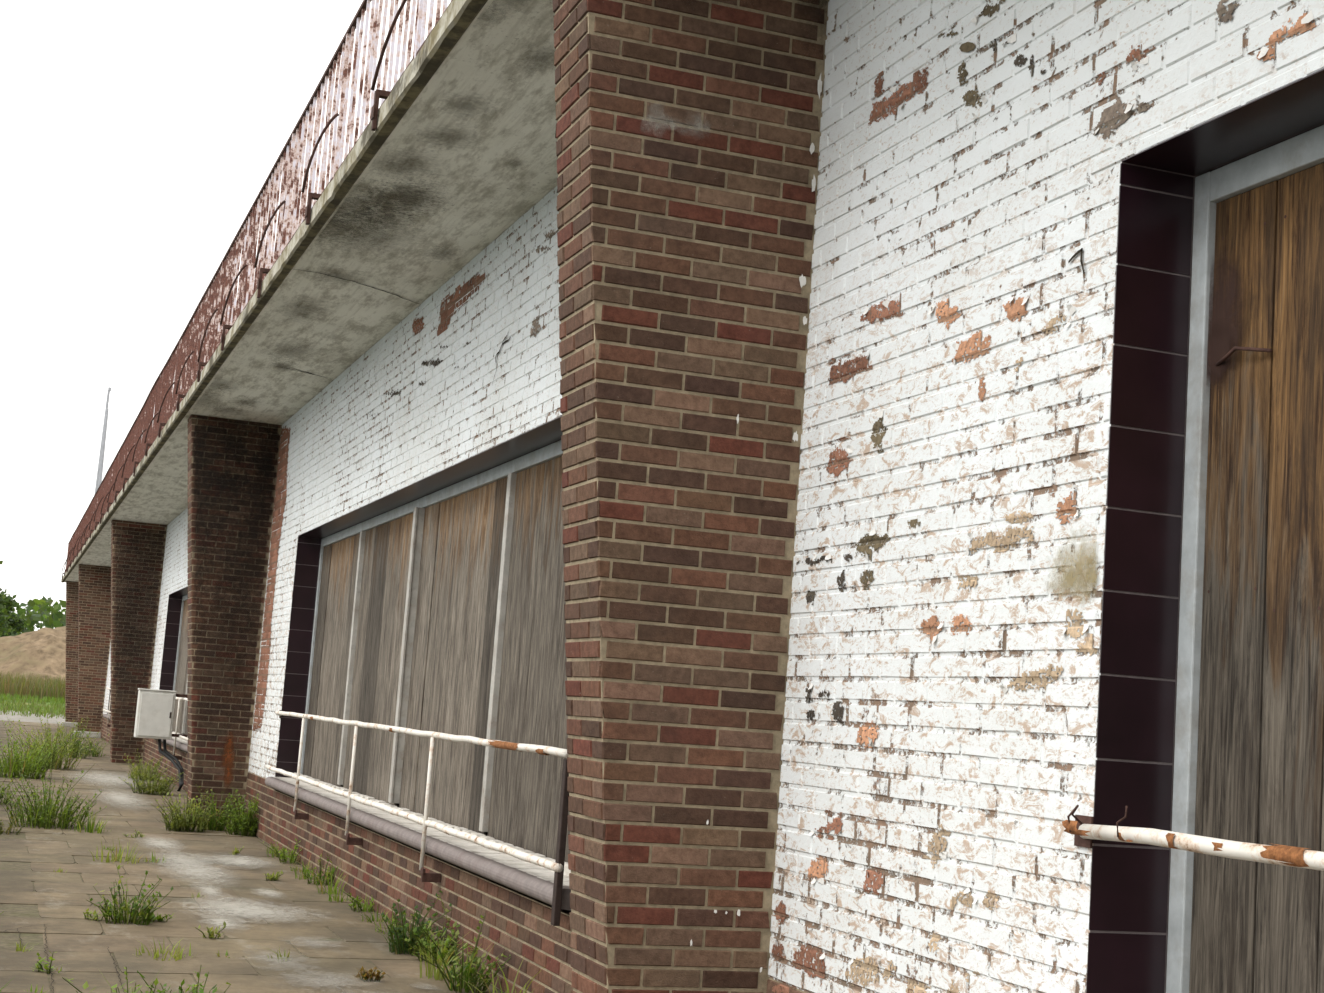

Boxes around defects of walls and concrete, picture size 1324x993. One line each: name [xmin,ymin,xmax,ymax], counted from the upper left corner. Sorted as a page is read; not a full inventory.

peeling [938,0,1046,119]
peeling [868,67,928,126]
peeling [1093,97,1151,140]
peeling [385,270,485,397]
peeling [928,296,991,366]
peeling [828,353,873,385]
peeling [796,528,890,592]
peeling [805,683,879,749]
rust [488,740,550,755]
rust [1062,820,1091,836]
rust [1260,843,1320,871]
peeling [772,943,826,979]